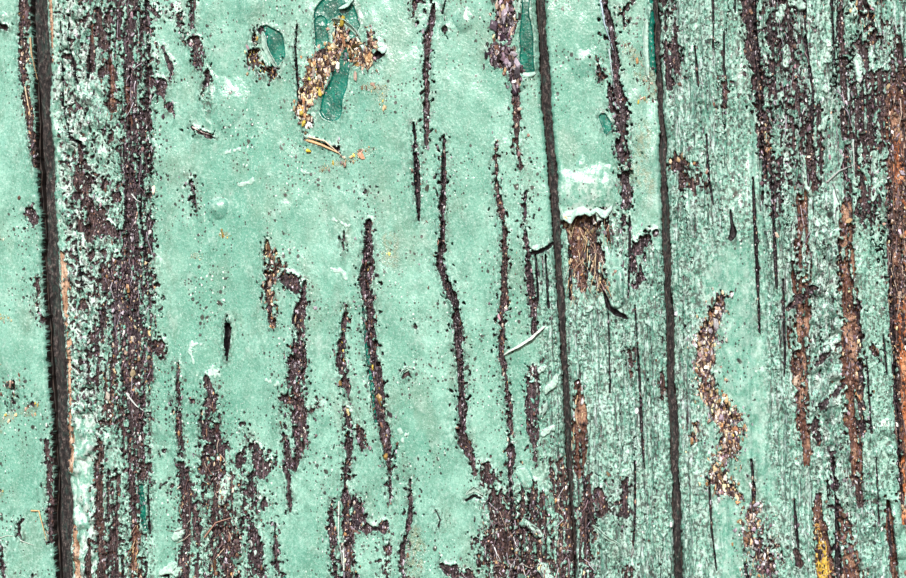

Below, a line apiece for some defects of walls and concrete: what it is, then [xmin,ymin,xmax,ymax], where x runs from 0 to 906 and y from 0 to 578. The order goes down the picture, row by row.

peeling [0,515,32,578]
peeling [0,373,37,415]
peeling [40,430,59,545]
peeling [51,0,293,578]
crack [224,316,233,362]
crack [252,186,425,578]
crack [407,0,687,577]
peeling [435,0,728,578]
peeling [740,0,906,578]